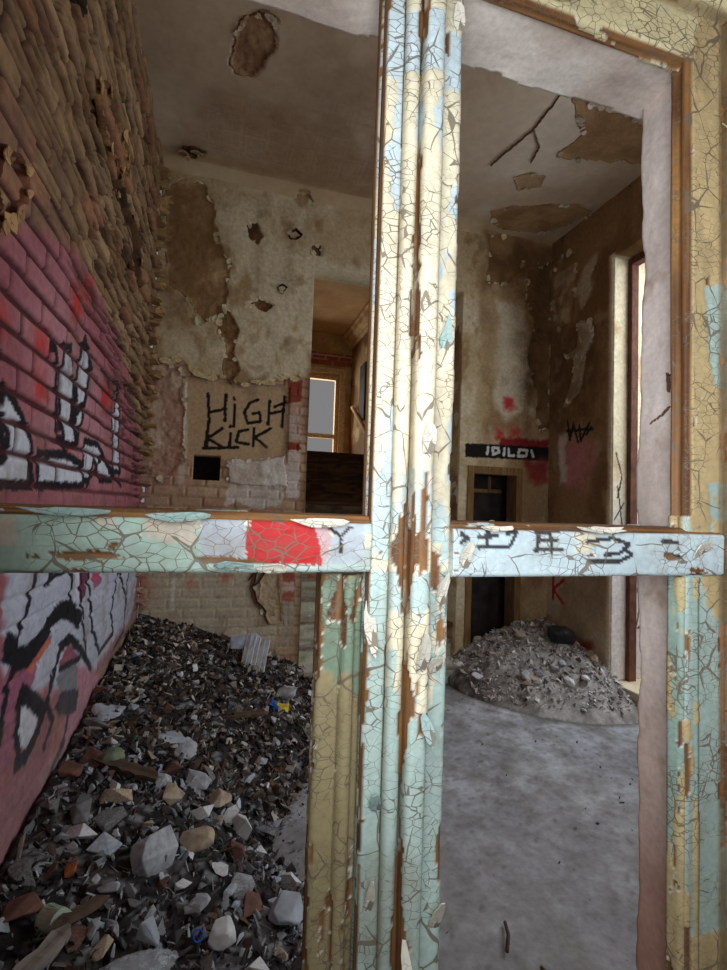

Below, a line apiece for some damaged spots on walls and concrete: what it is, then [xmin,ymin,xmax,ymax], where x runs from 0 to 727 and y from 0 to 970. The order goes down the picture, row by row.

spalling [230,9,281,78]
crack [490,95,560,166]
peeling [556,97,643,164]
spalling [247,222,263,245]
spalling [137,164,251,523]
spalling [250,295,274,312]
flaking render [486,203,594,433]
peeling [226,456,289,489]
peeling [15,506,111,517]
crack [248,573,268,624]
peeling [364,601,378,659]
peeling [401,939,412,970]